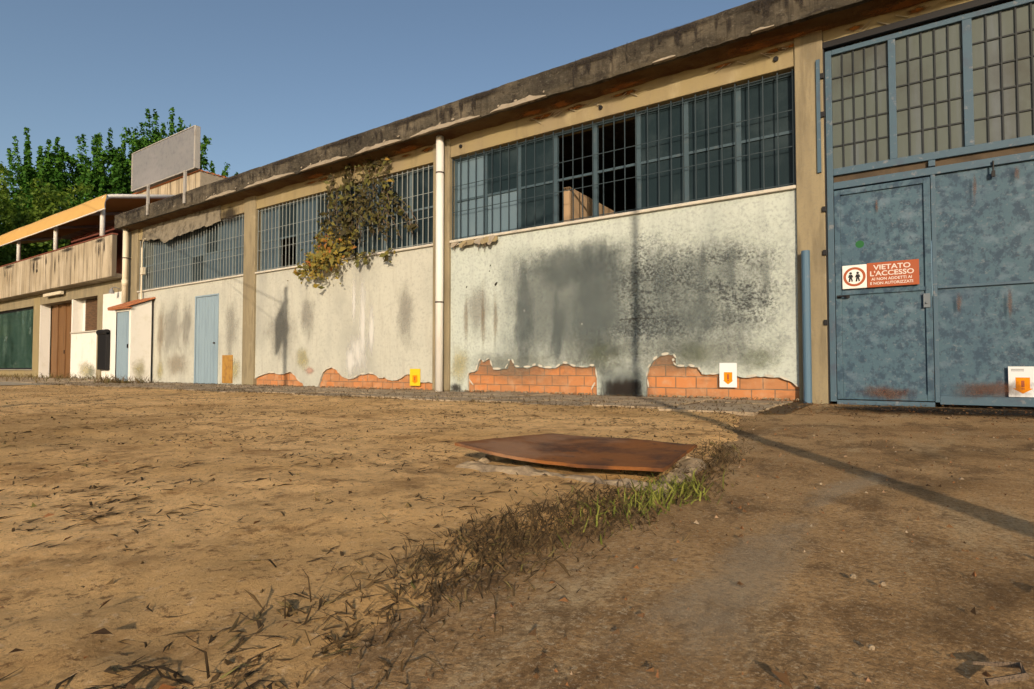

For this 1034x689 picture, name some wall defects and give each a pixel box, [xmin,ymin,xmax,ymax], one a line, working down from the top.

flaking render [257,371,303,387]
flaking render [320,367,432,390]
flaking render [467,358,597,395]
flaking render [646,352,799,402]